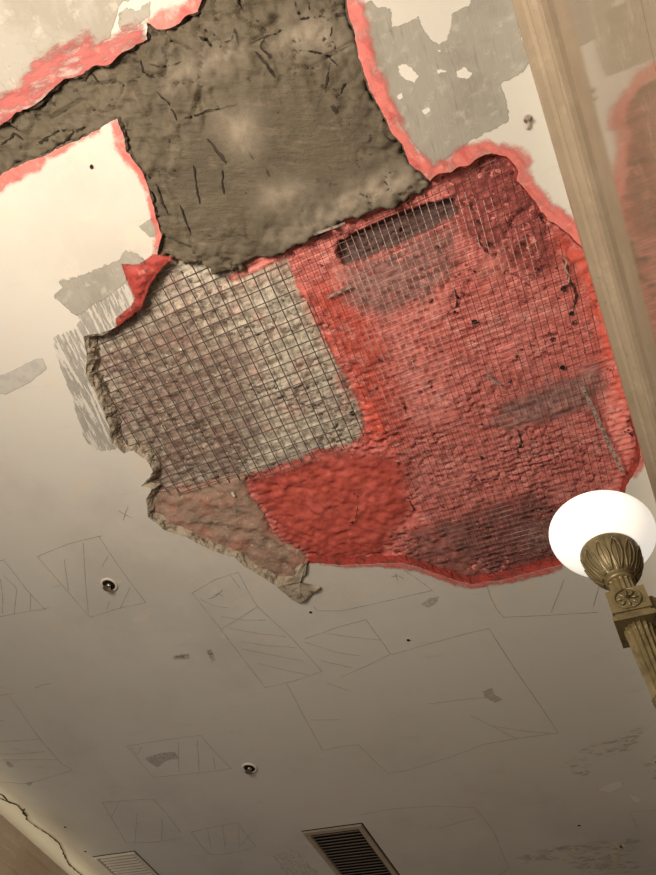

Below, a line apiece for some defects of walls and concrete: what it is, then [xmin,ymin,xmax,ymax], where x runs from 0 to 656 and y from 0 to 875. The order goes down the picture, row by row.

flaking render [0,0,644,603]
crack [0,794,83,875]